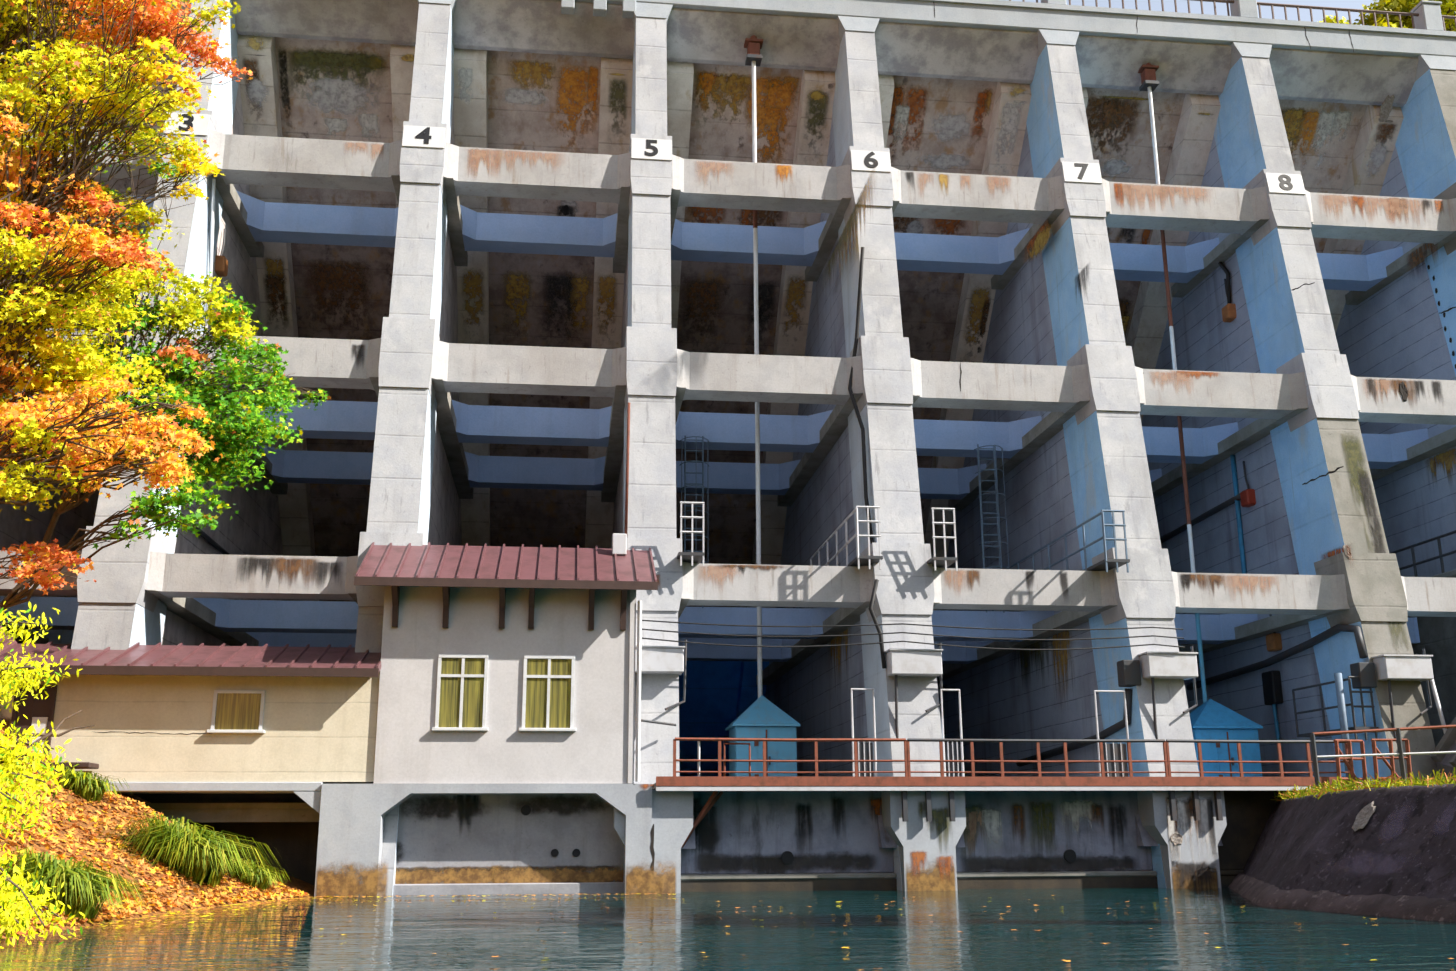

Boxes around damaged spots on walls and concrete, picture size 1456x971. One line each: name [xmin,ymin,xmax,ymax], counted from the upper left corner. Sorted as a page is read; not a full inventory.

damp [243,50,378,137]
rust [696,72,798,178]
rust [906,172,970,189]
rust [1114,183,1205,202]
rust [1323,195,1443,215]
rust [1155,371,1216,384]
damp [1343,437,1385,553]
damp [402,795,480,827]
damp [518,796,604,815]
damp [693,798,873,874]
damp [919,801,1135,872]
rust [907,851,956,891]